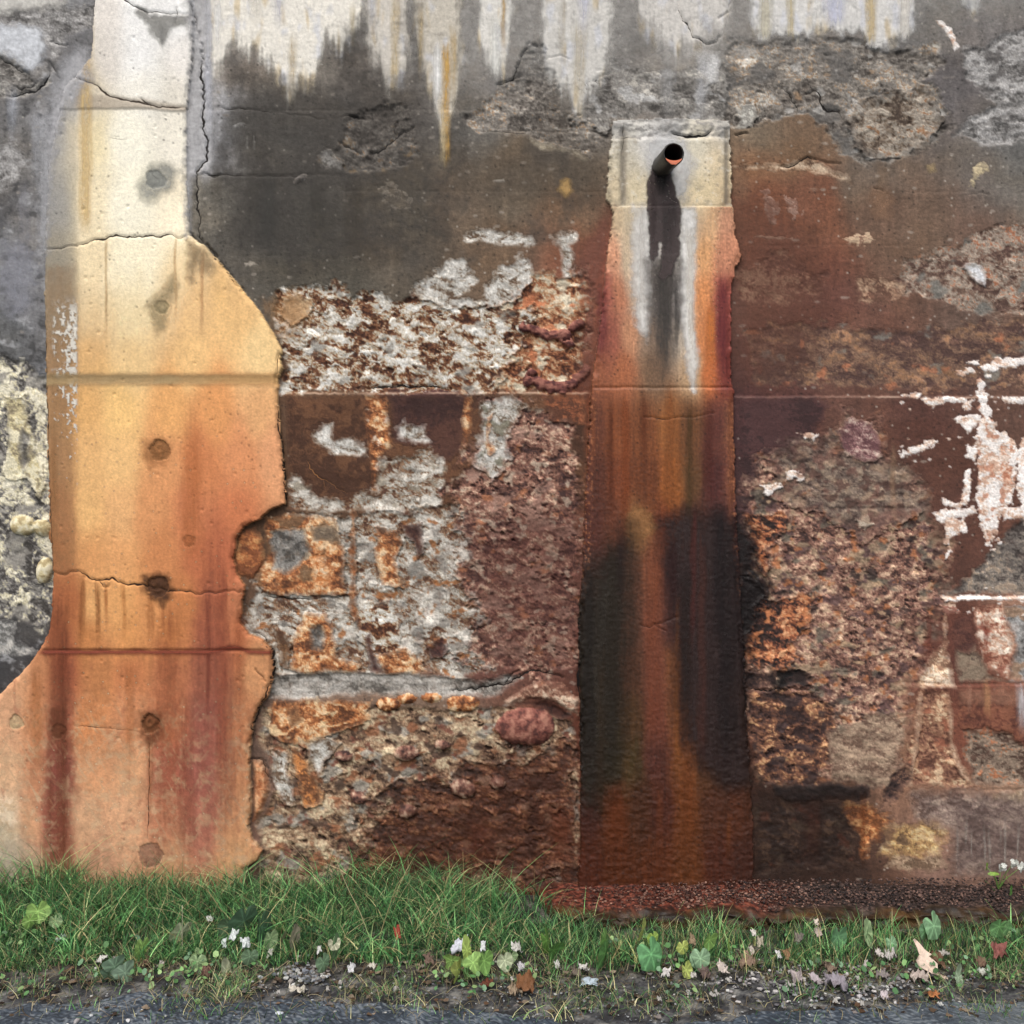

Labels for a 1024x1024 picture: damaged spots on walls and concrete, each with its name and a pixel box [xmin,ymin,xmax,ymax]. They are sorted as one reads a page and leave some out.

crack [3,43,316,291]
water stain [136,0,932,257]
water stain [626,137,697,393]
spalling [461,20,1024,170]
spalling [0,352,54,657]
crack [45,306,240,595]
corrosion [0,265,286,891]
spalling [233,228,603,896]
water stain [580,538,633,803]
corrosion [577,207,754,887]
water stain [659,513,774,786]
spalling [734,221,1024,882]